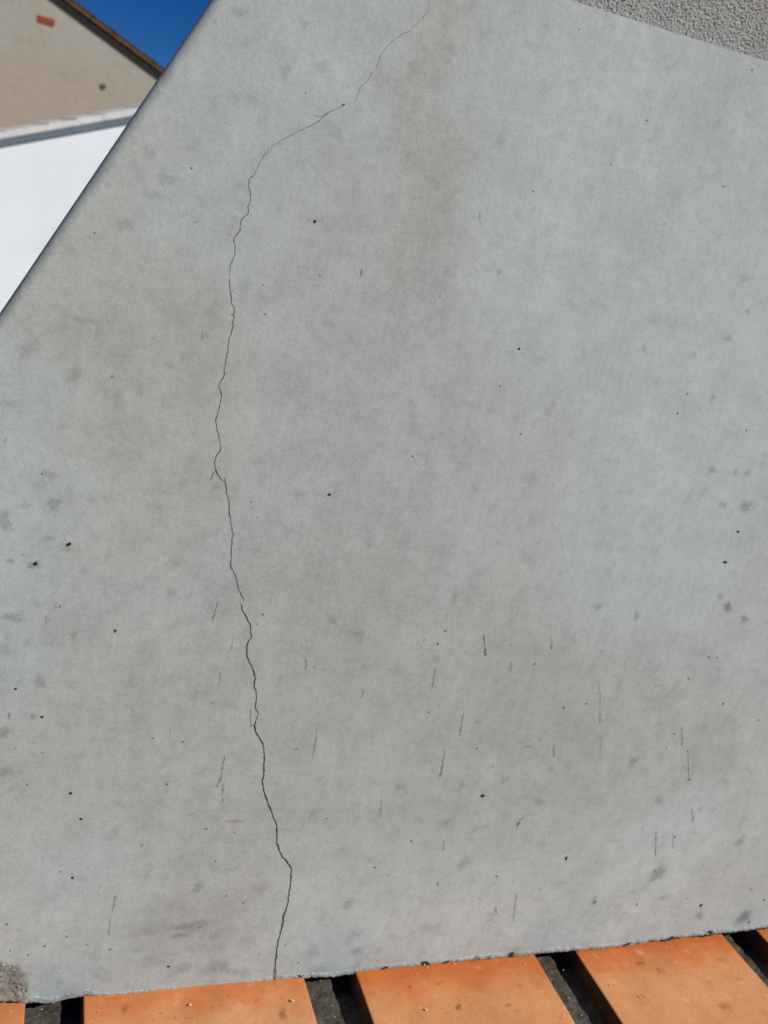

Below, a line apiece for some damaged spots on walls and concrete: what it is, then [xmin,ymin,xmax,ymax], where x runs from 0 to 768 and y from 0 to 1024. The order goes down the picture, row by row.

crack [211,5,429,980]